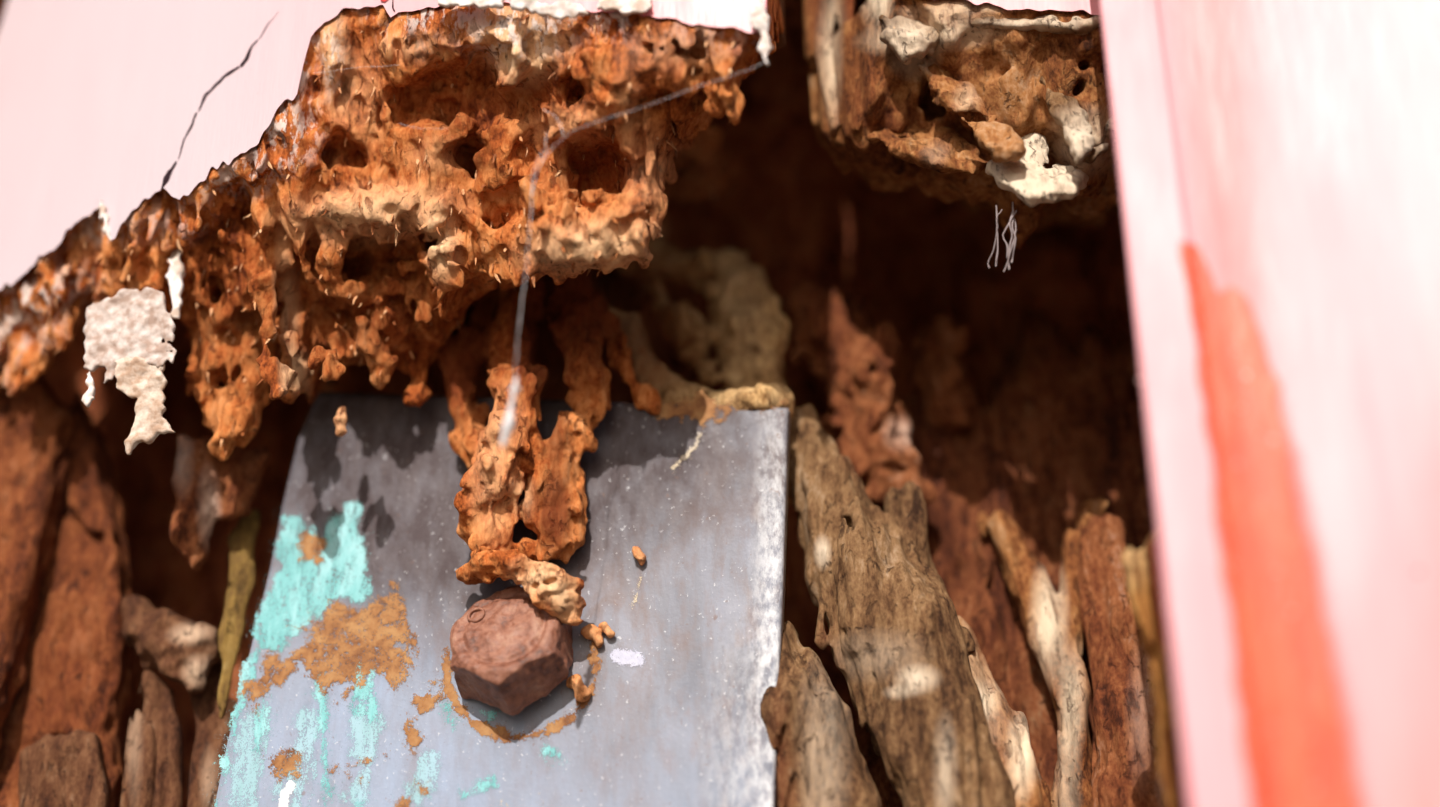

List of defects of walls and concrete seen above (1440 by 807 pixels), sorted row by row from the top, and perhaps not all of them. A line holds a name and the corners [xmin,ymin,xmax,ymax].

peeling [438,0,653,20]
peeling [750,0,774,66]
crack [161,11,279,190]
peeling [98,200,112,241]
peeling [81,249,185,455]
corrosion [656,386,788,428]
corrosion [291,526,328,570]
peeling [211,498,500,807]
corrosion [235,579,602,807]